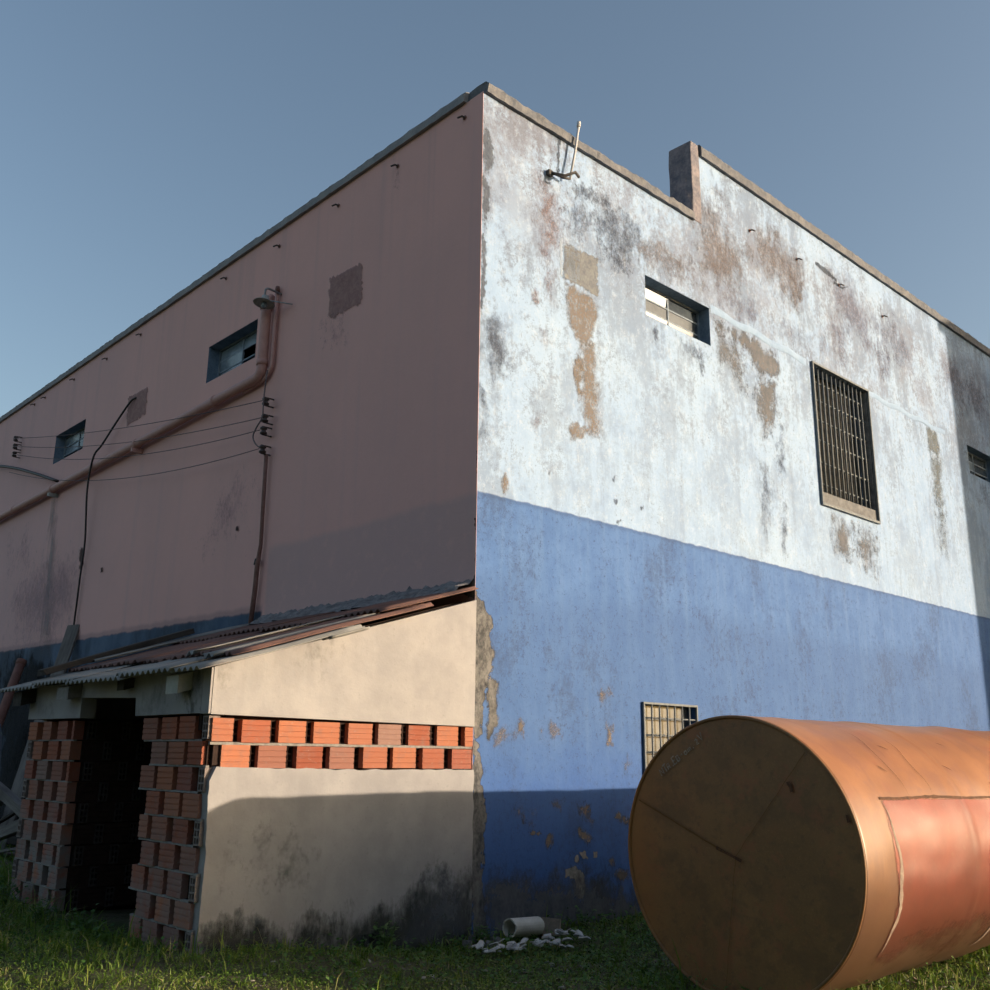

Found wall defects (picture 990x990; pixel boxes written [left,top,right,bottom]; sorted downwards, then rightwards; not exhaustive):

flaking render [328,263,362,318]
flaking render [563,245,599,297]
water stain [927,428,943,525]
water stain [0,652,51,790]
spalling [464,575,524,938]
water stain [197,868,643,953]